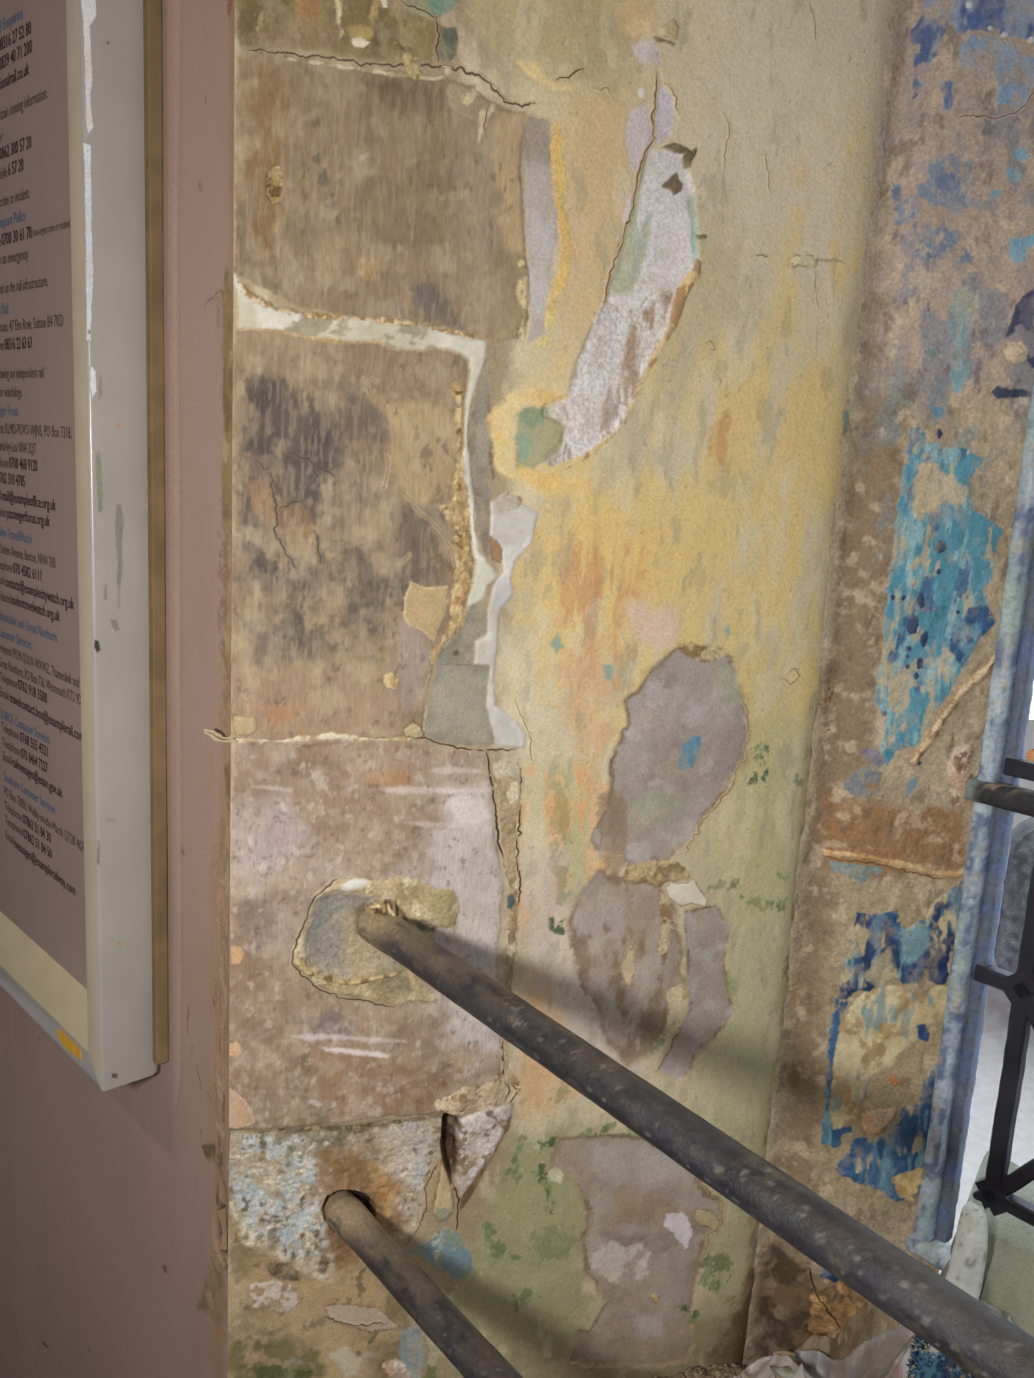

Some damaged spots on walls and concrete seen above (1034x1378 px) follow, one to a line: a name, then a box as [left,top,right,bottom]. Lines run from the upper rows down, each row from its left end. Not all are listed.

crack [242,0,537,139]
peeling [908,0,1034,114]
peeling [544,0,708,472]
peeling [870,147,1034,767]
crack [204,696,536,992]
flaking render [187,46,575,1378]
spalling [945,741,978,809]
corrosion [301,1138,416,1275]
crack [500,1036,522,1105]
flaking render [820,880,963,1204]